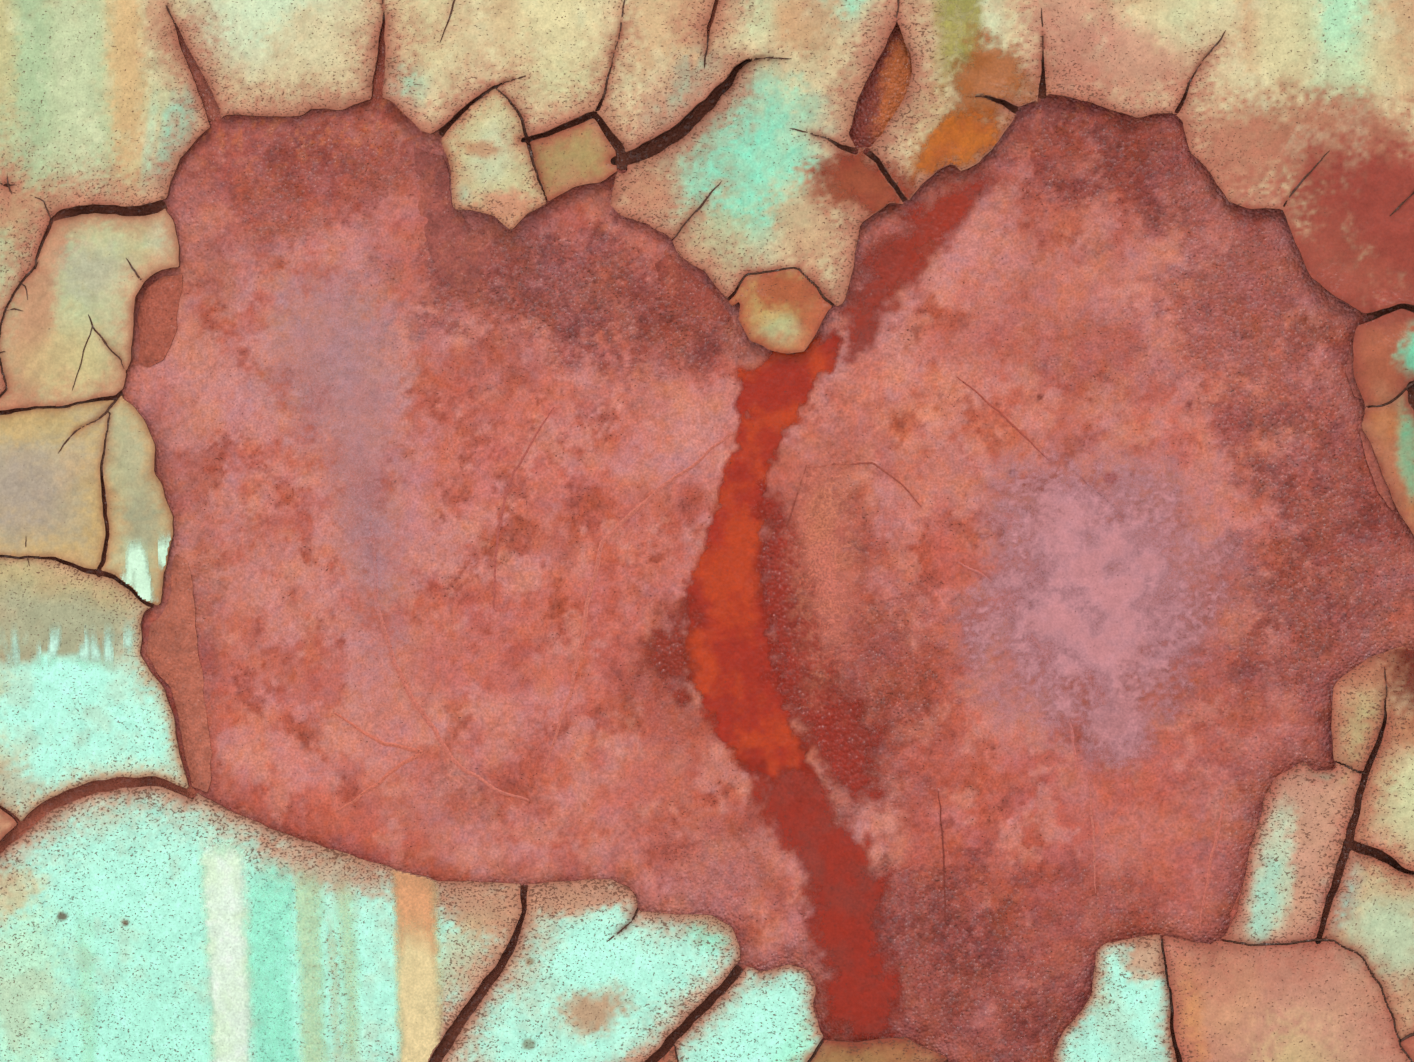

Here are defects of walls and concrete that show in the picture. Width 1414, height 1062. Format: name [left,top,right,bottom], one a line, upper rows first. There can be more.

crack [439,0,792,202]
crack [974,8,1047,114]
crack [0,176,168,608]
peeling [0,0,1016,1062]
rust [645,31,1031,1040]
peeling [729,0,1414,1062]
crack [0,776,196,853]
crack [1224,667,1414,1062]
rust [395,872,441,1062]
crack [429,884,528,1062]
crack [645,965,743,1062]
crack [1161,938,1183,1062]